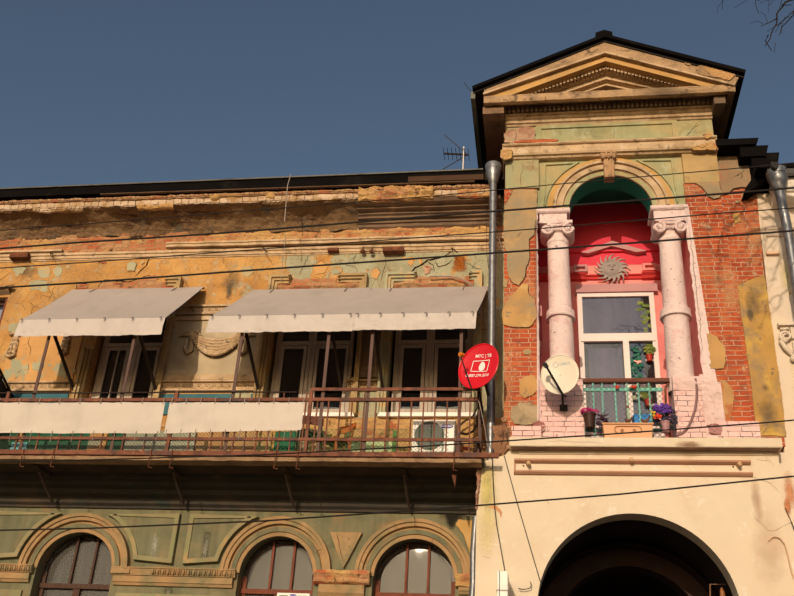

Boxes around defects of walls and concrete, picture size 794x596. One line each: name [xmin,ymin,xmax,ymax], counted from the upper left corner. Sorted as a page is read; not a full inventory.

flaking render [691,132,751,200]
spalling [33,206,84,214]
spalling [137,203,174,211]
peeling [0,265,69,293]
spalling [76,260,160,289]
crack [411,252,482,272]
flaking render [502,189,537,328]
flaking render [737,274,786,437]